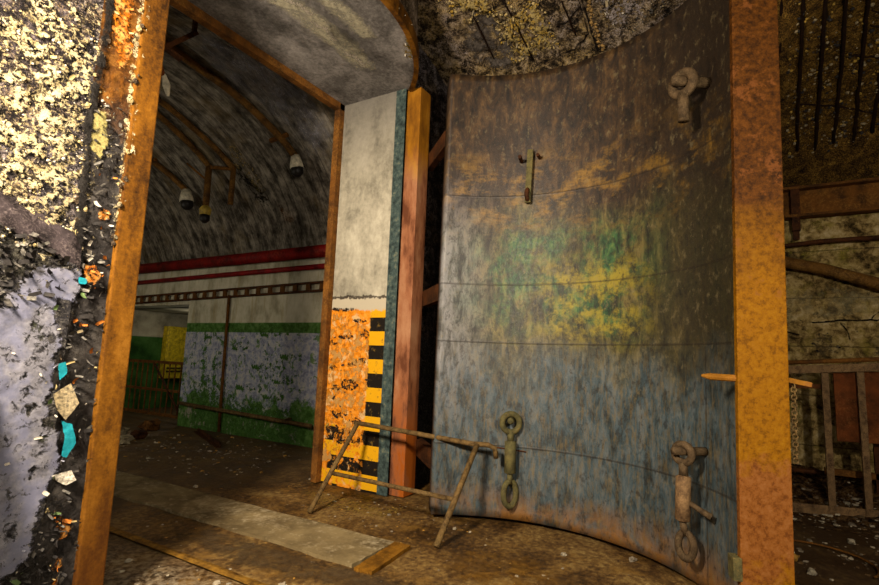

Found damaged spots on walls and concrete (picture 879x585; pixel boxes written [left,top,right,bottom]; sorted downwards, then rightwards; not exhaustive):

peeling [191,327,303,404]
peeling [322,307,369,462]